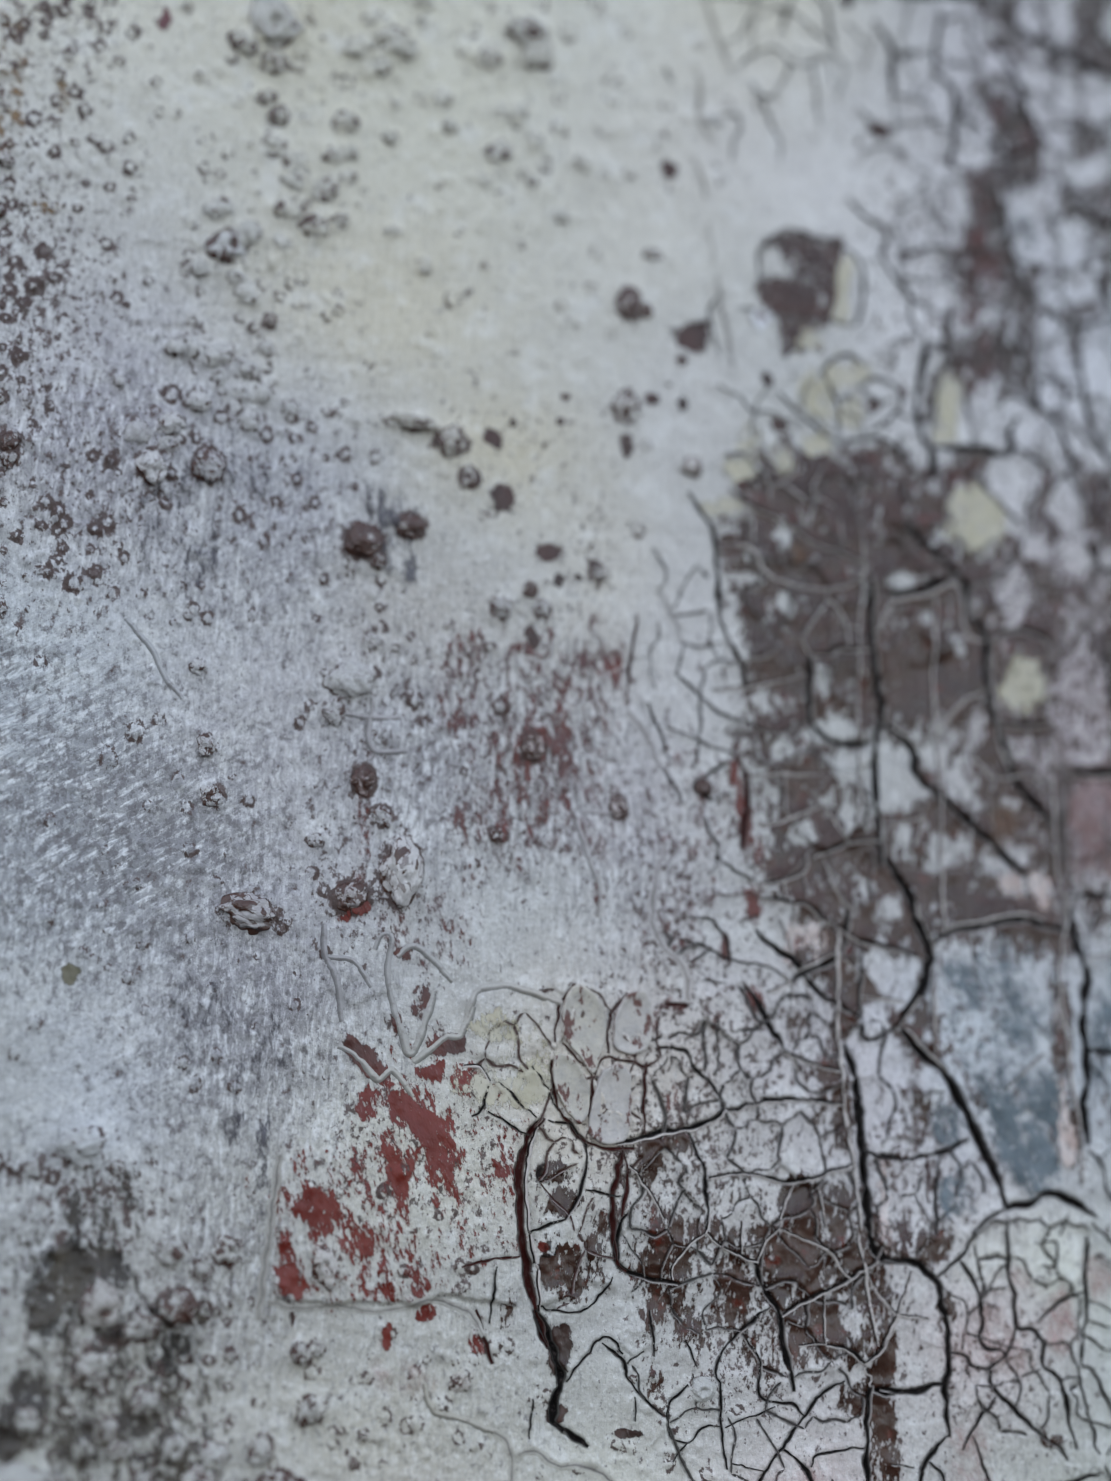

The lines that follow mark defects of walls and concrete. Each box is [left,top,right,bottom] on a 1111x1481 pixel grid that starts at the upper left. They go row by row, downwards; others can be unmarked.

corrosion [0,7,42,153]
corrosion [30,200,63,215]
peeling [660,159,678,179]
peeling [868,122,891,140]
peeling [943,0,1111,221]
peeling [644,383,689,412]
peeling [670,320,711,366]
peeling [748,222,851,387]
crack [255,0,1111,1481]
peeling [500,394,1111,1481]